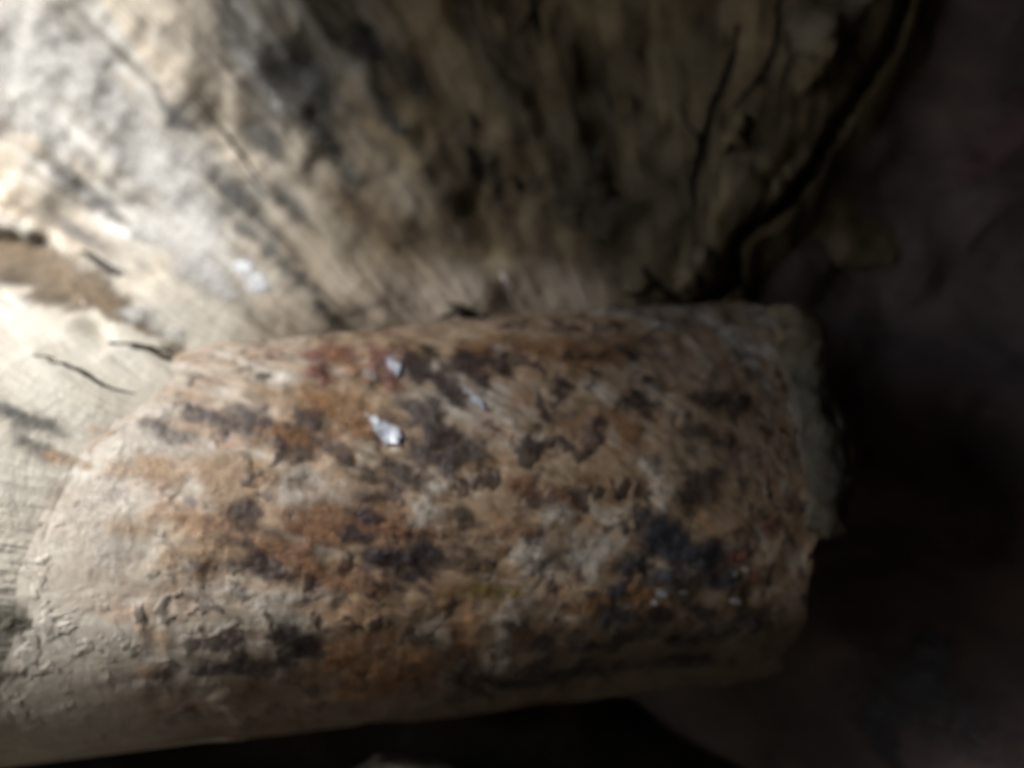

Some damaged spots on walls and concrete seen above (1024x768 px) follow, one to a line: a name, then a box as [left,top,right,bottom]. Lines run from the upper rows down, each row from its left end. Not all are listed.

crack [108,341,177,362]
crack [33,354,134,394]
corrosion [257,488,431,595]